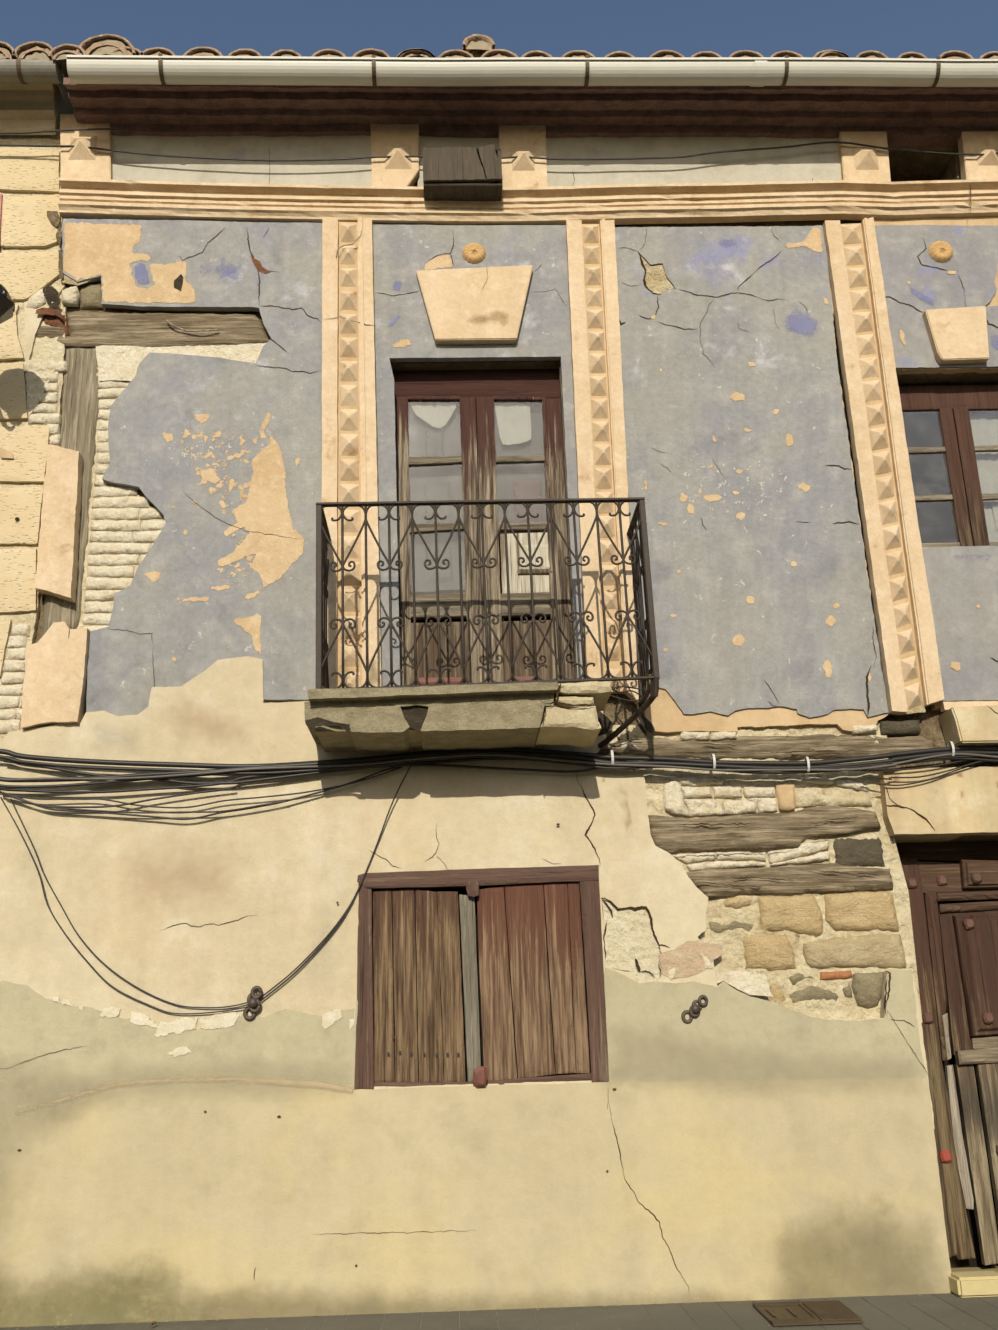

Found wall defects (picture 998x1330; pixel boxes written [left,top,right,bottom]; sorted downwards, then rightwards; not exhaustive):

peeling [27,211,196,309]
crack [619,230,808,359]
flaking render [24,360,68,447]
flaking render [82,343,266,631]
peeling [162,412,304,602]
peeling [678,435,811,522]
flaking render [0,623,30,733]
peeling [234,615,261,654]
spalling [599,695,934,1023]
peeling [100,1006,239,1057]
peeling [321,1009,354,1029]
crack [607,1105,690,1295]